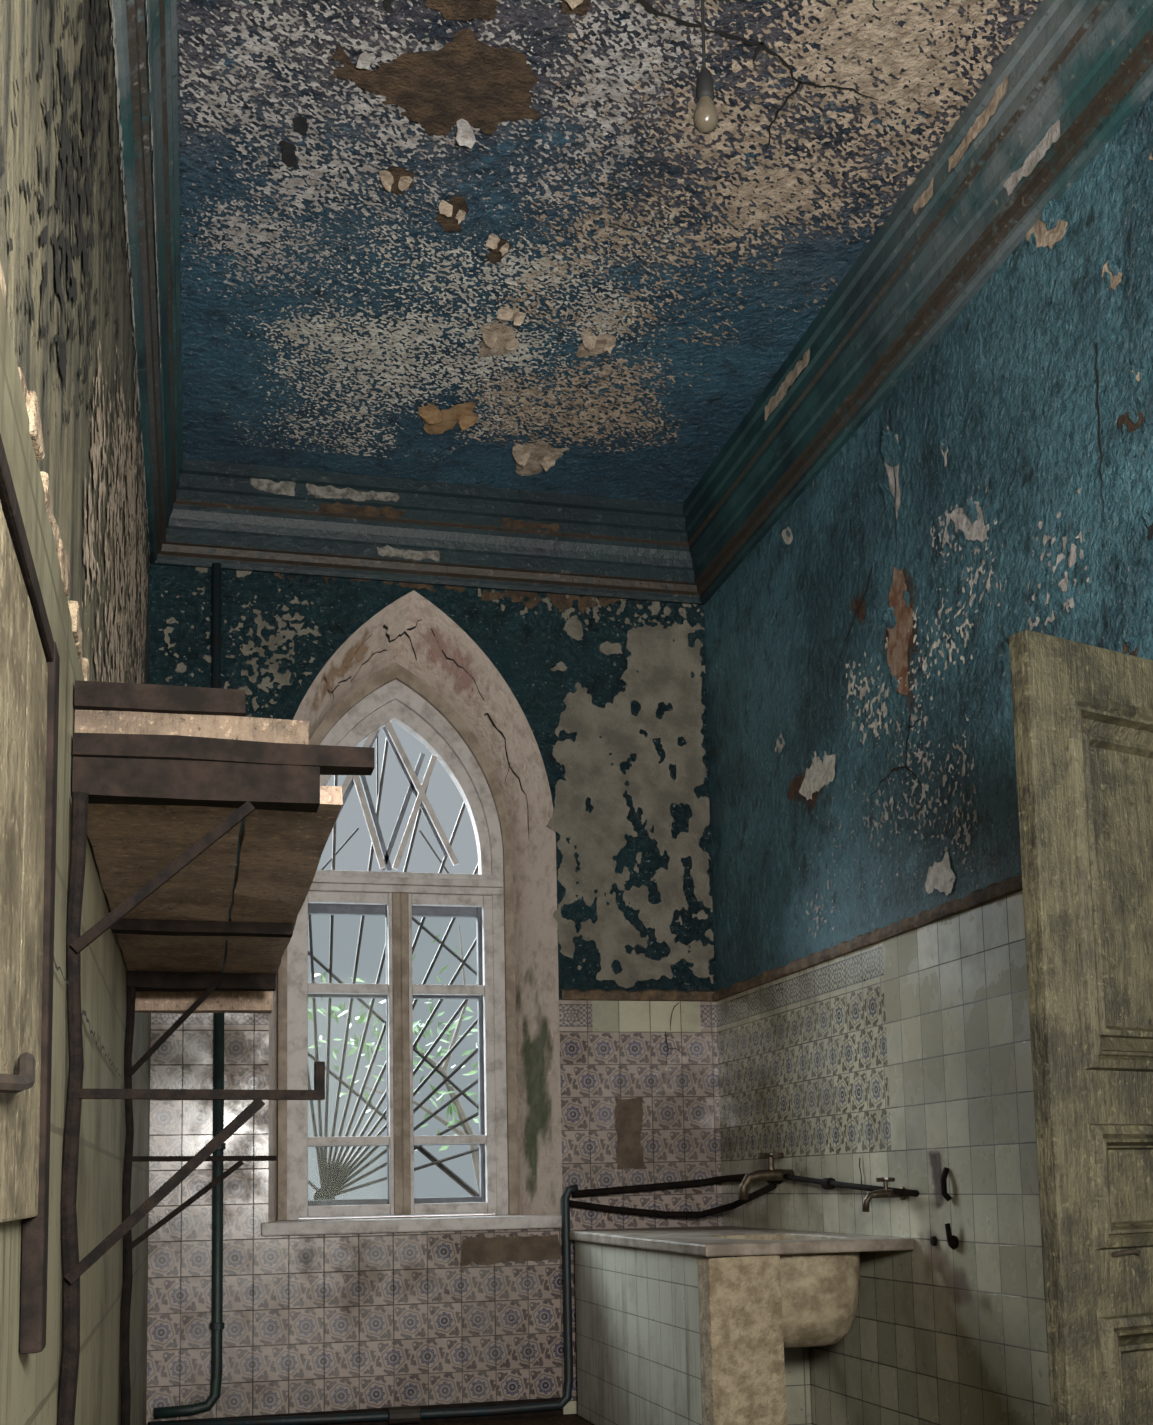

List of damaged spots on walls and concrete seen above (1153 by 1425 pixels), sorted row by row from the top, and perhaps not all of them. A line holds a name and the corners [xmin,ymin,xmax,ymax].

crack [637,0,878,151]
peeling [1004,119,1061,196]
peeling [179,0,1043,476]
peeling [1025,199,1068,254]
peeling [1102,260,1122,290]
peeling [0,0,714,988]
peeling [782,527,793,548]
peeling [1025,504,1090,630]
peeling [775,734,785,753]
peeling [798,479,1010,938]